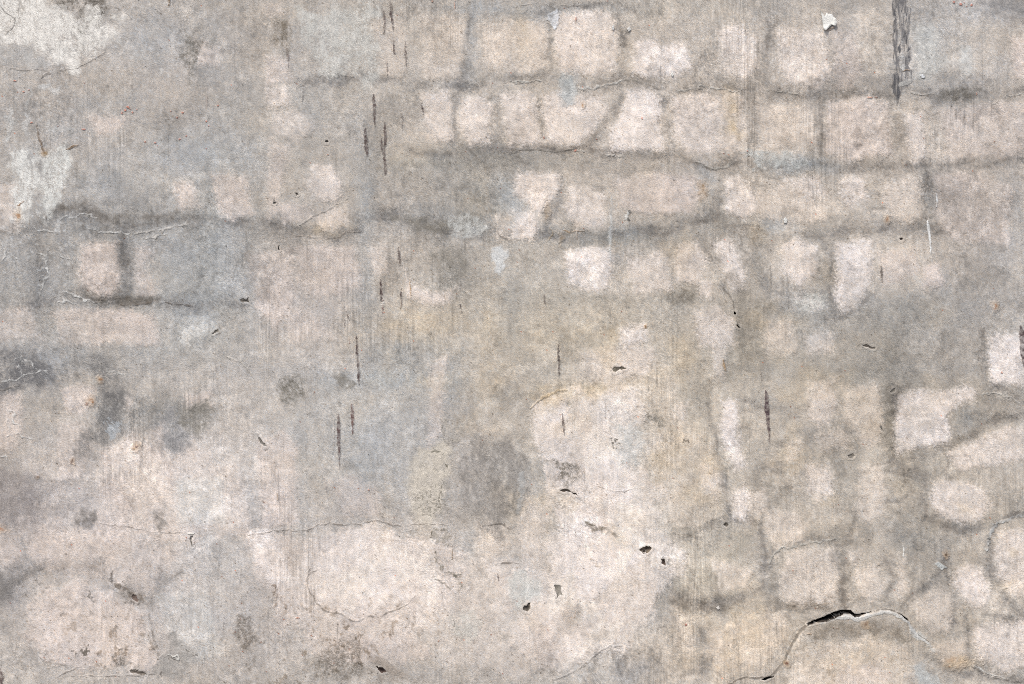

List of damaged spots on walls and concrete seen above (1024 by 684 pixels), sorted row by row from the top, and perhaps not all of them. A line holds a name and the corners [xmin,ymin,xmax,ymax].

peeling [820,10,837,32]
water stain [889,0,987,108]
water stain [454,429,537,543]
crack [99,522,187,534]
crack [247,519,512,536]
crack [494,559,519,567]
spalling [636,543,668,568]
spalling [550,581,566,603]
crack [727,607,929,684]